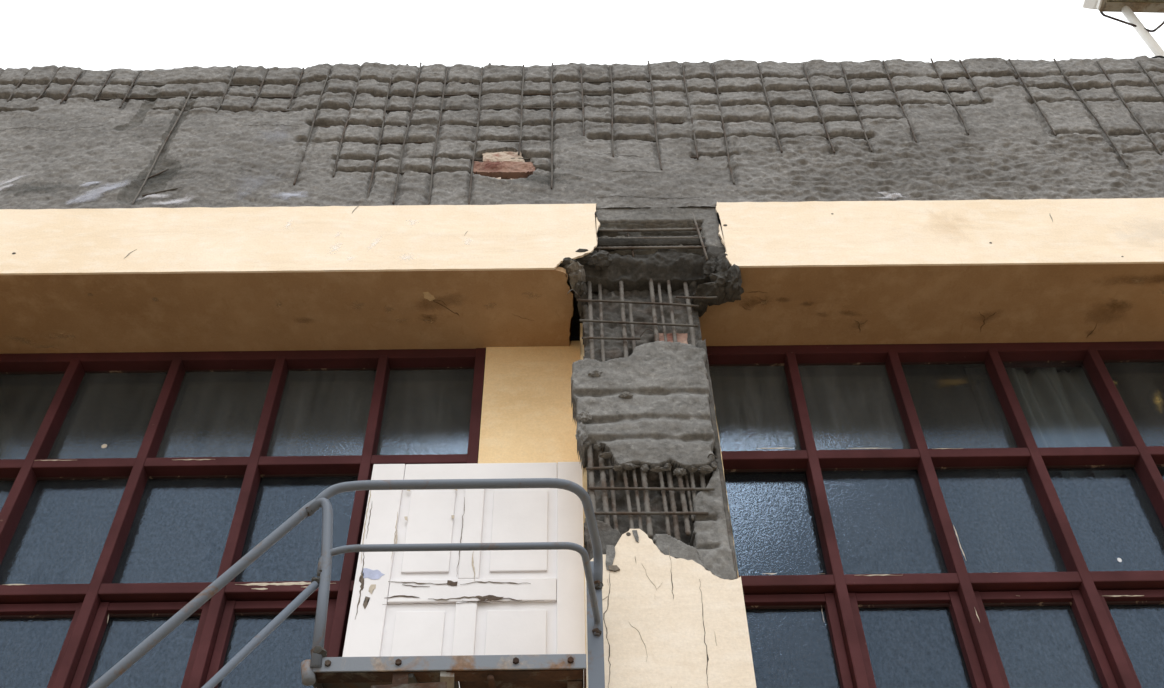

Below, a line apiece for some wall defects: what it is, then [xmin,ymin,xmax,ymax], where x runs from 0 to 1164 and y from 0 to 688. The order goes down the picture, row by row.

spalling [0,55,1164,205]
spalling [558,205,744,579]
crack [603,574,647,688]
crack [635,547,717,685]